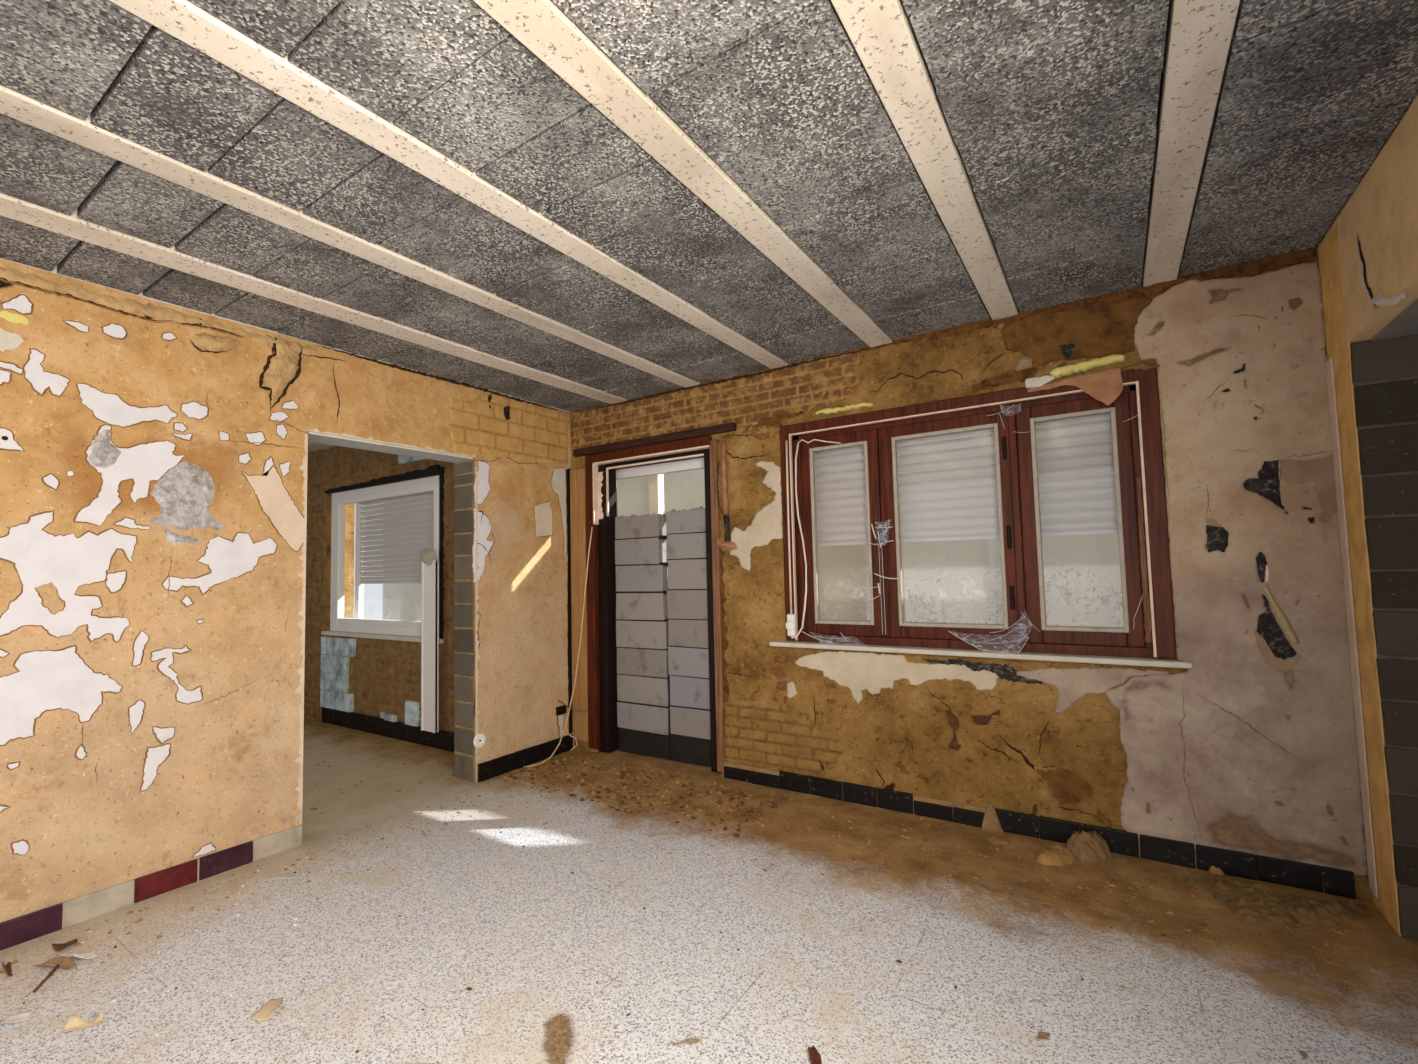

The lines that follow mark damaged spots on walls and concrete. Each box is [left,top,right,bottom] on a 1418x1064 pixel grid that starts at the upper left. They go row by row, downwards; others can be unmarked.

crack [1357,232,1377,307]
peeling [1243,454,1338,523]
flaking render [0,248,1317,824]
crack [925,687,1054,775]
crack [1179,682,1314,845]
peeling [11,839,30,856]
peeling [192,842,216,857]